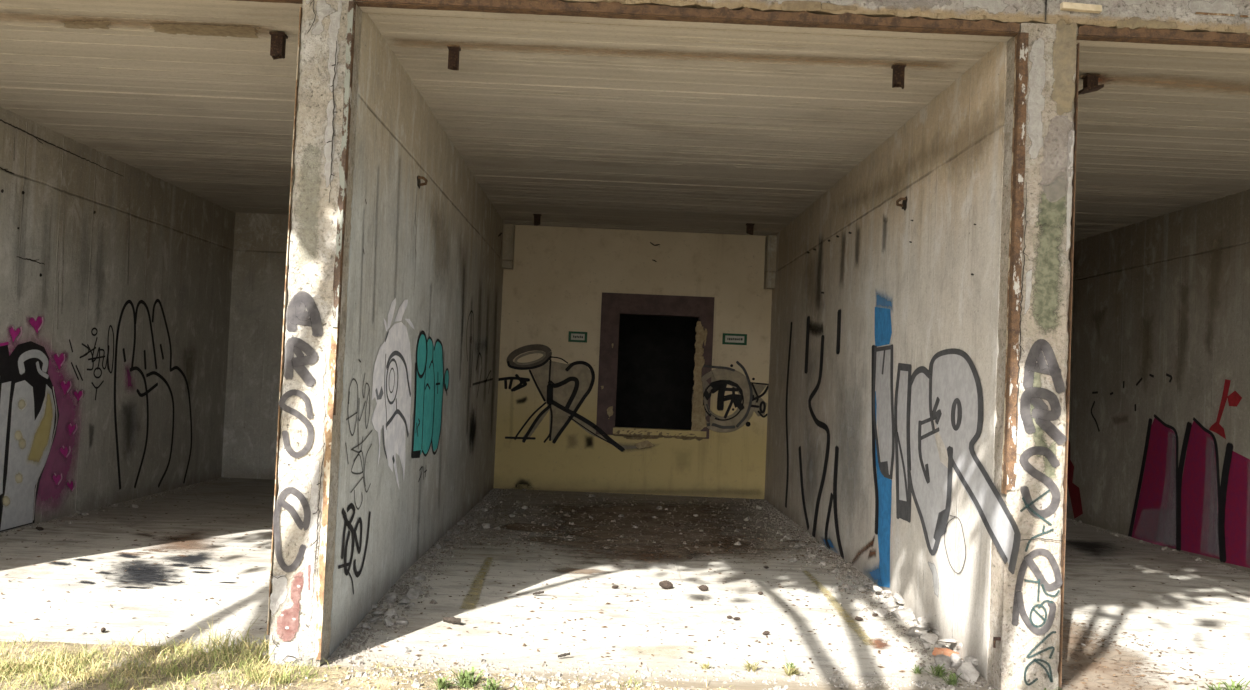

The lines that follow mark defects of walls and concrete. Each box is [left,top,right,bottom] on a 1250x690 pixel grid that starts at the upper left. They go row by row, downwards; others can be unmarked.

peeling [306,0,342,188]
rust [403,42,940,67]
leakage [1032,170,1068,333]
peeling [270,352,326,665]